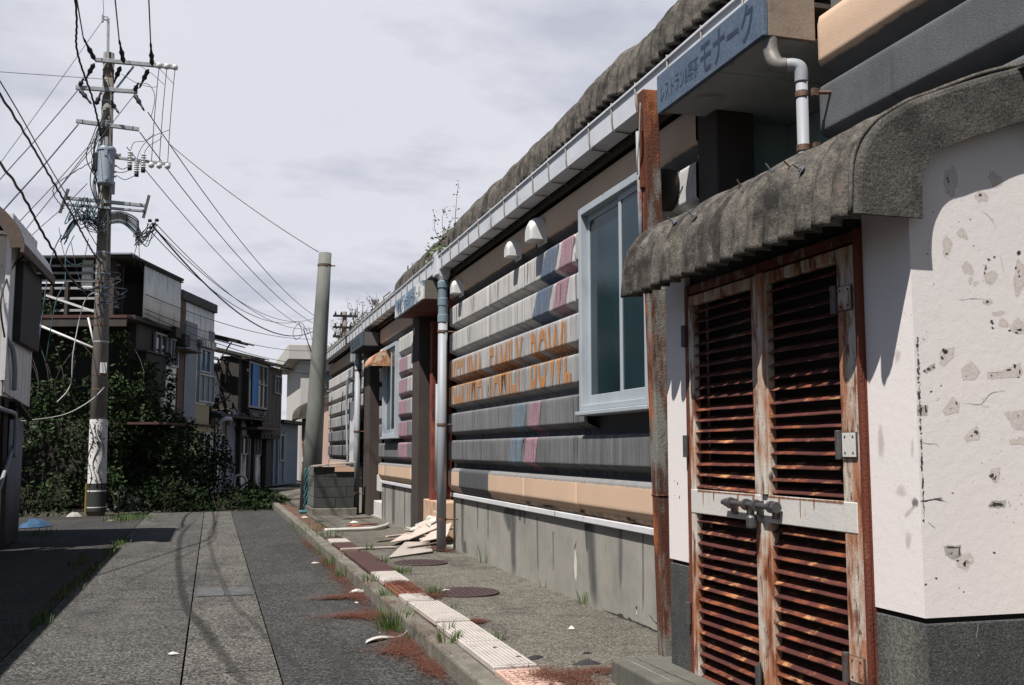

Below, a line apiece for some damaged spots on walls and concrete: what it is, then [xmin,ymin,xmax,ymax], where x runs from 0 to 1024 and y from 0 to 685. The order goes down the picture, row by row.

peeling [983,299,1024,334]
peeling [923,347,1023,381]
peeling [943,397,960,415]
peeling [964,425,980,442]
peeling [1005,410,1024,445]
peeling [989,467,1000,482]
peeling [988,500,1006,508]
peeling [945,545,974,569]